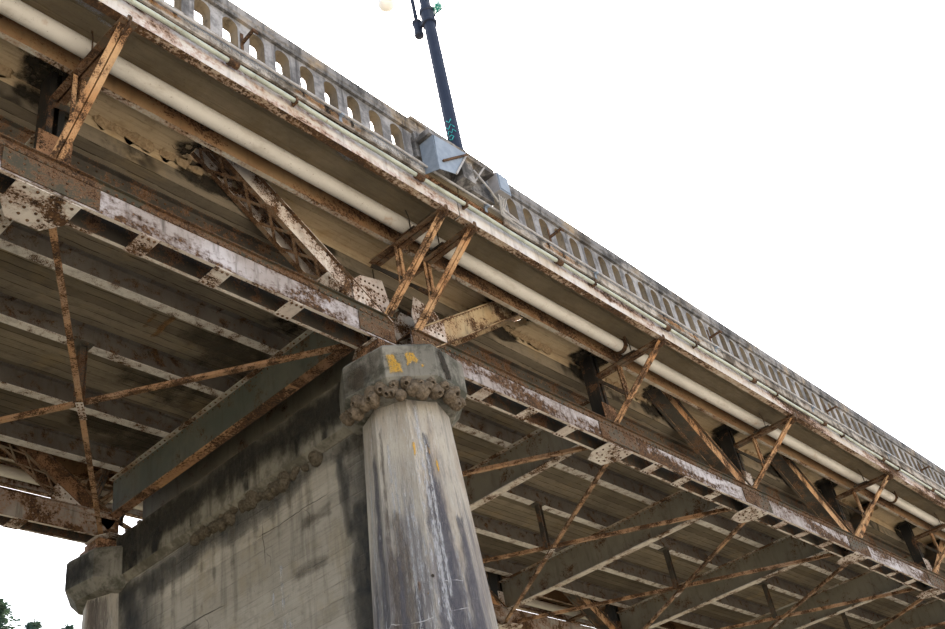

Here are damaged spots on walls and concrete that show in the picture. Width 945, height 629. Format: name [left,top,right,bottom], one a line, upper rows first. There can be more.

leakage [87,597,108,629]
leakage [70,410,152,450]
leakage [119,472,306,629]
leakage [116,356,377,574]
leakage [326,406,488,629]
leakage [437,350,451,380]